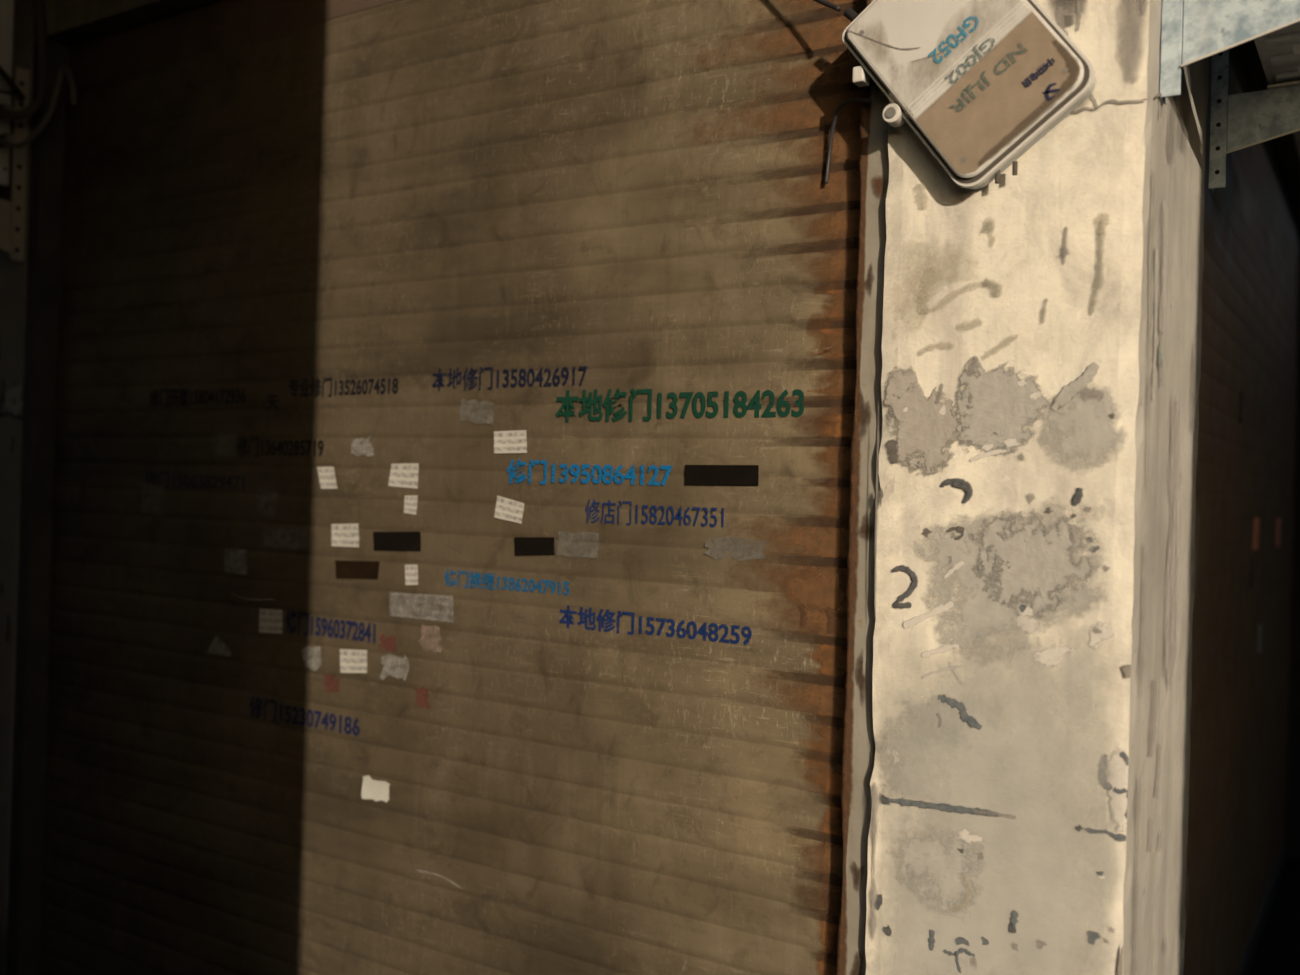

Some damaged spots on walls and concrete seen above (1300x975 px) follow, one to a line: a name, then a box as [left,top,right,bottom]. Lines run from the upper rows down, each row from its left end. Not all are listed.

damp [1056,0,1082,36]
damp [1121,0,1148,81]
rust [740,0,885,975]
peeling [874,356,1126,617]
peeling [870,488,1129,975]
crack [881,794,1015,819]
crack [943,948,975,973]